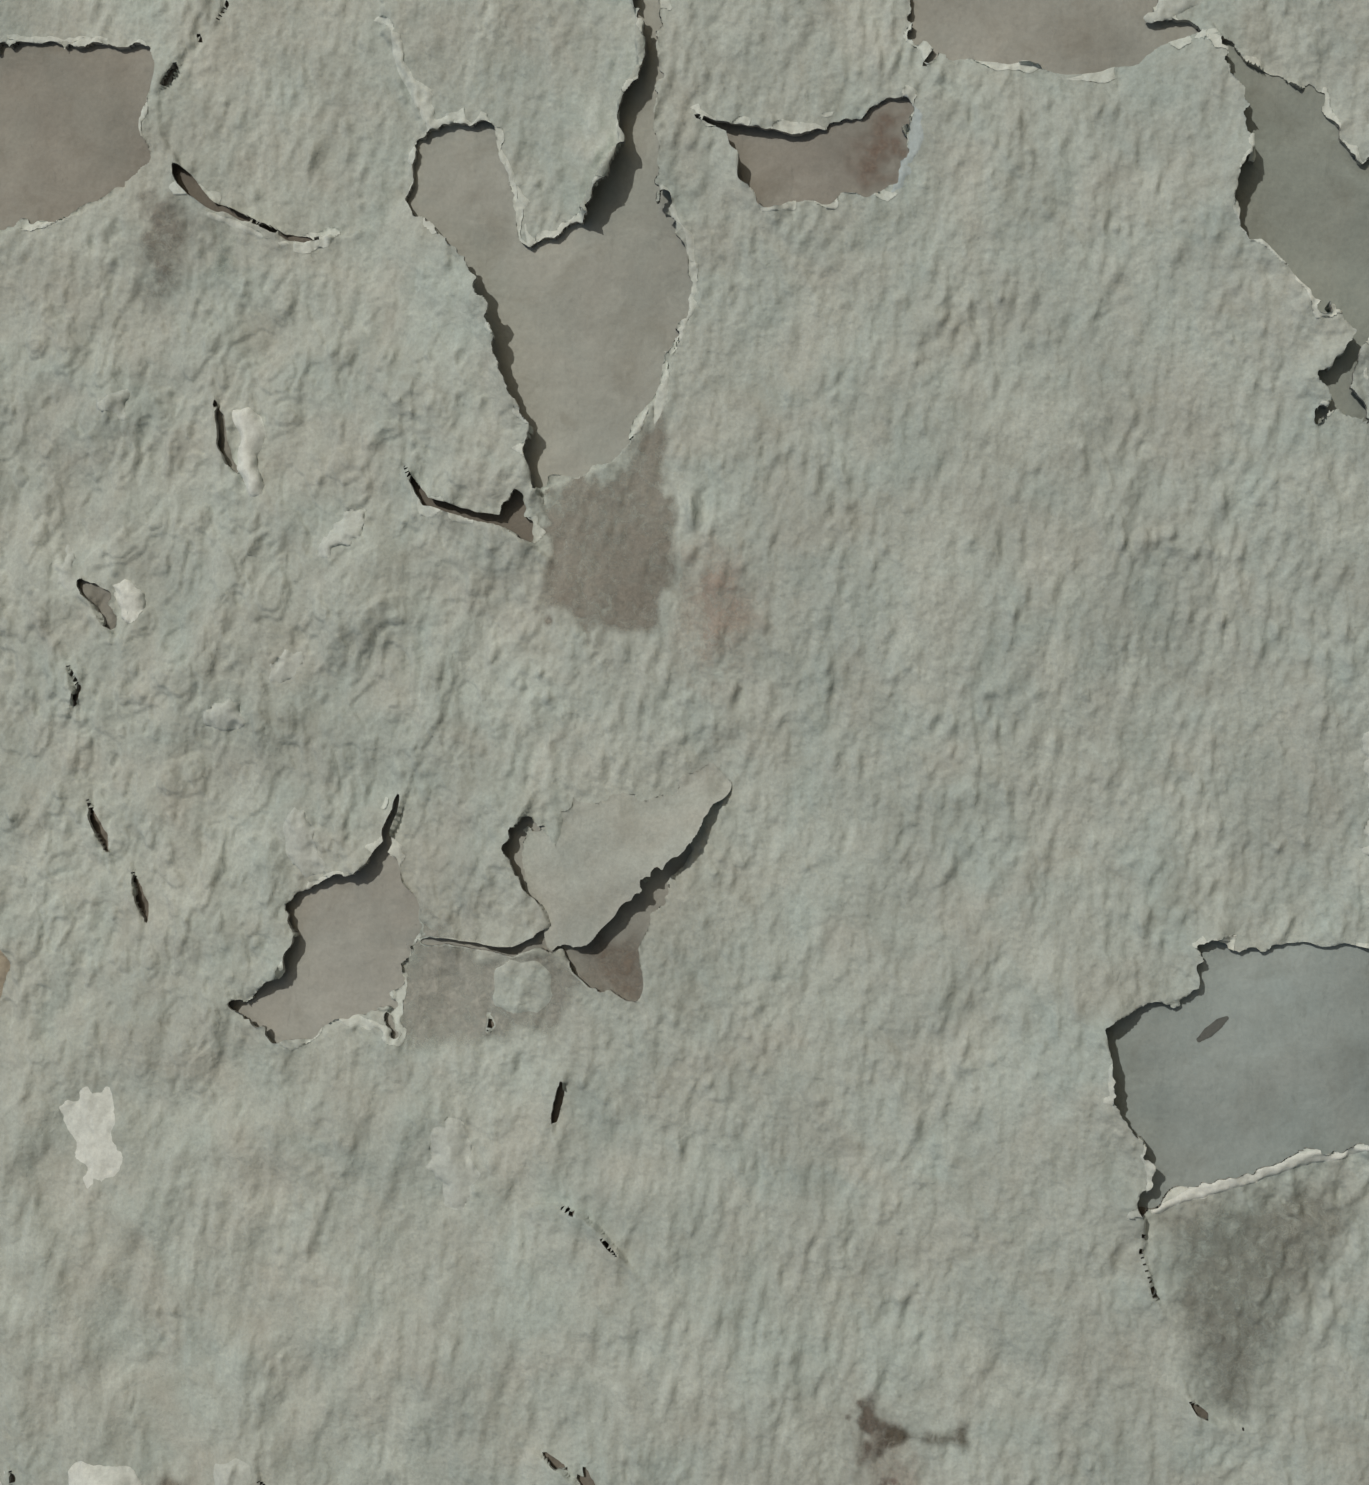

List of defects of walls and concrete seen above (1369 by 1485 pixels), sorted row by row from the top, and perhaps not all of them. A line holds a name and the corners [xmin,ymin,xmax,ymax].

peeling [0,34,174,231]
peeling [368,0,924,508]
peeling [889,0,1369,424]
peeling [205,400,266,497]
crack [383,465,547,578]
peeling [216,763,732,1071]
peeling [1043,914,1369,1254]
crack [528,1206,631,1269]
crack [533,1452,595,1485]